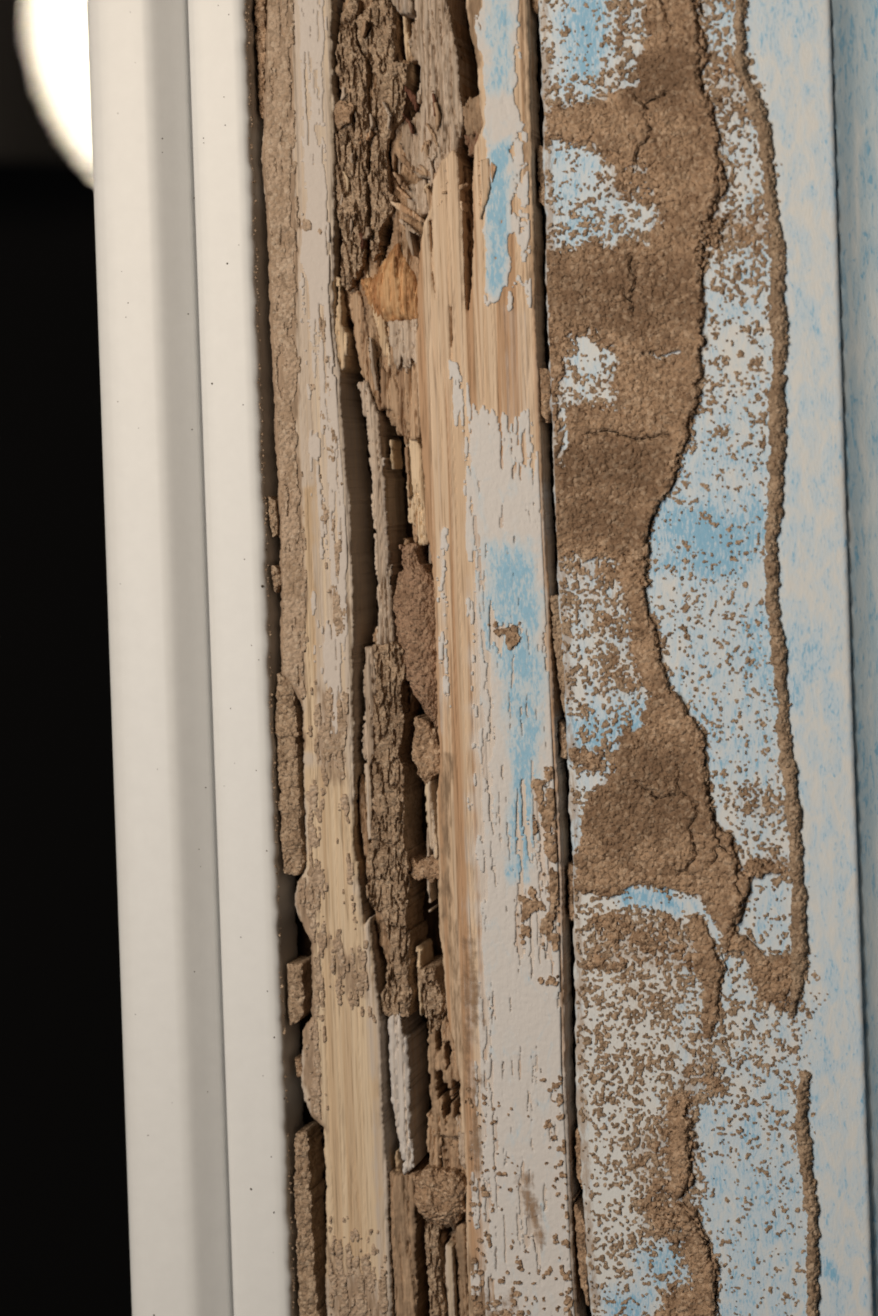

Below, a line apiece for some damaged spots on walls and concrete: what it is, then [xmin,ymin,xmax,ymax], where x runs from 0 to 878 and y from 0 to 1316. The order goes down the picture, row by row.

peeling [474,0,532,312]
peeling [293,0,420,734]
peeling [436,527,451,707]
spalling [366,641,447,1033]
peeling [448,360,575,1316]
spalling [424,1220,452,1316]